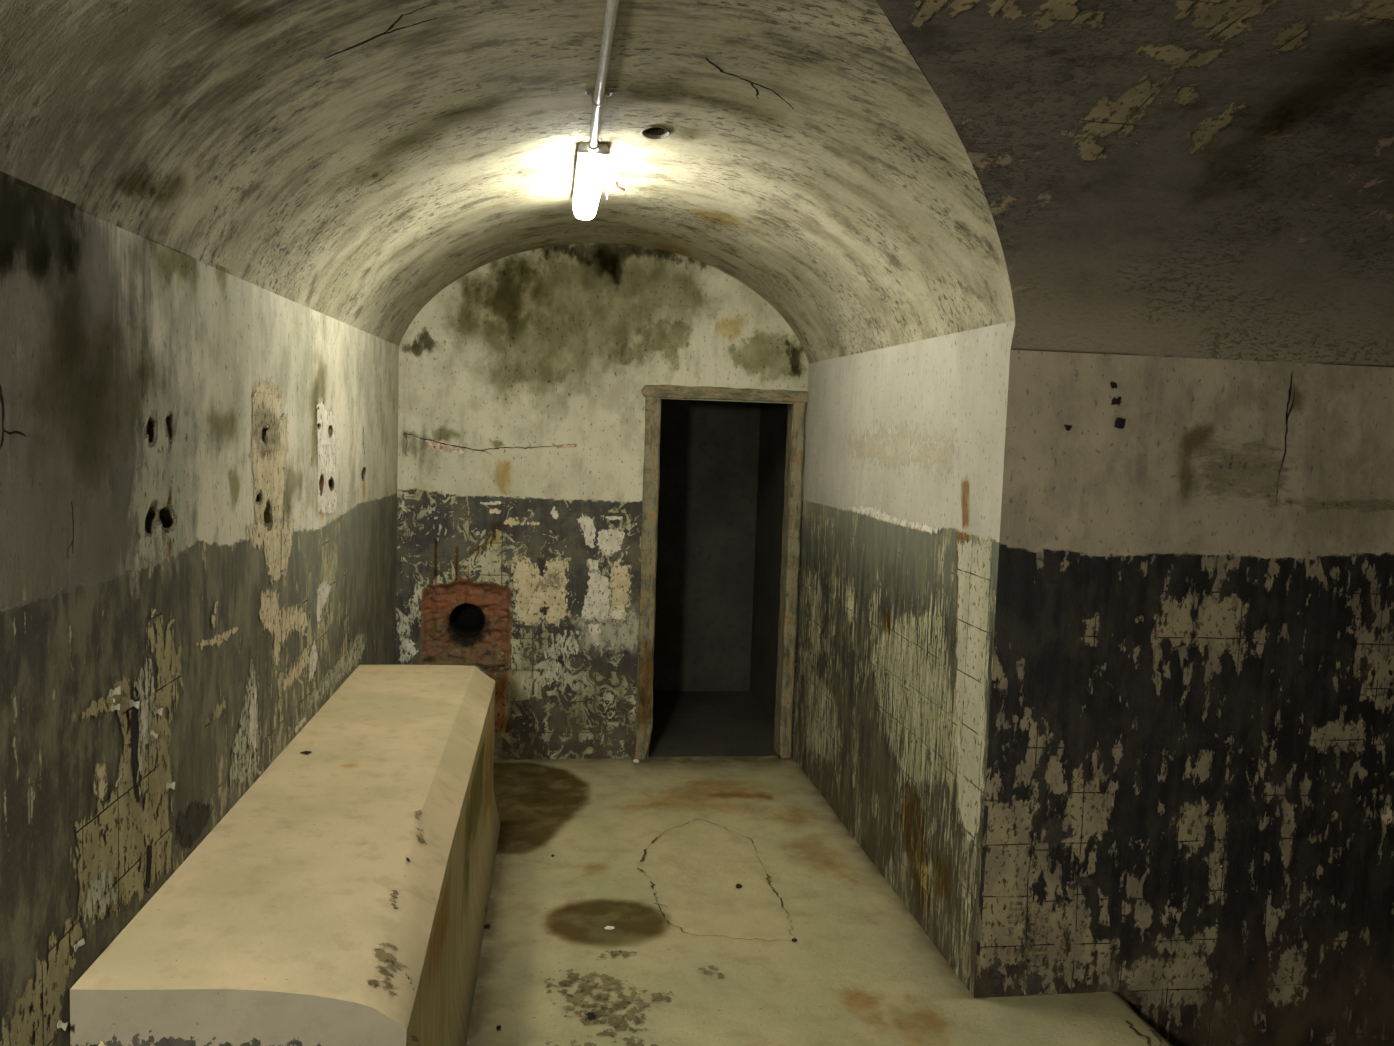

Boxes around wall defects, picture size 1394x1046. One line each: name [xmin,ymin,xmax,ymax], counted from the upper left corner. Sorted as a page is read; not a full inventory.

crack [324,4,436,60]
crack [706,58,794,109]
leakage [0,172,80,279]
leakage [404,331,433,355]
crack [1276,372,1294,504]
flaking render [202,379,367,795]
spalling [396,513,639,682]
peeling [0,600,239,1046]
leakage [494,763,585,852]
leakage [550,901,664,942]
crack [637,818,795,941]
peeling [874,537,1228,1017]